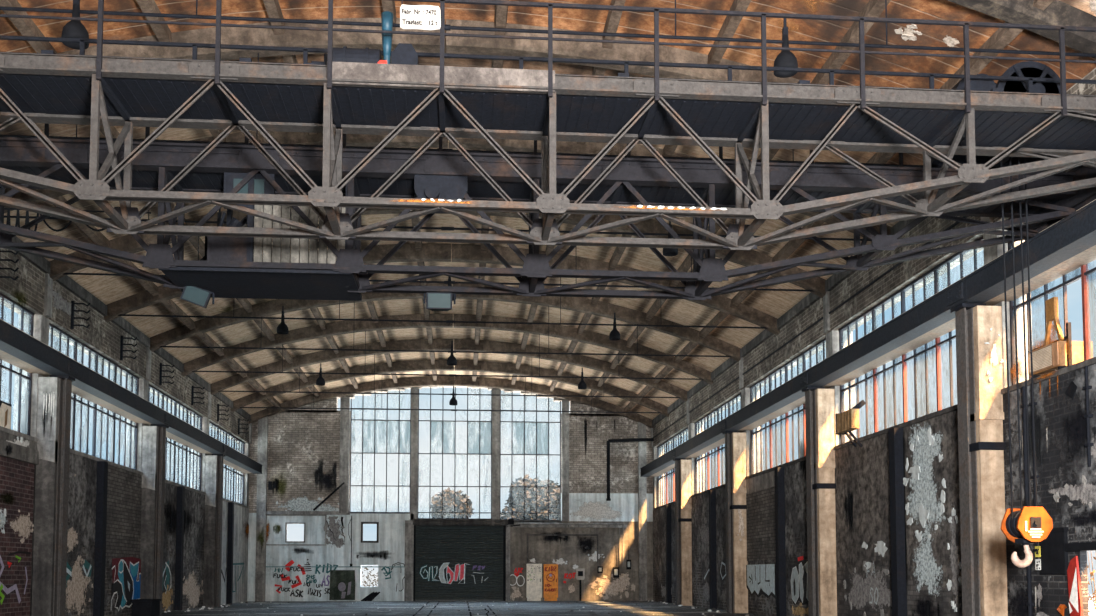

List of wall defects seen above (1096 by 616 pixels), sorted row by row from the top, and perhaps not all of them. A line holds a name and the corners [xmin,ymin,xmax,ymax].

peeling [894,24,922,41]
peeling [943,36,959,47]
peeling [1048,428,1096,508]
peeling [0,509,34,544]
peeling [903,422,962,612]
flaking render [843,541,892,616]